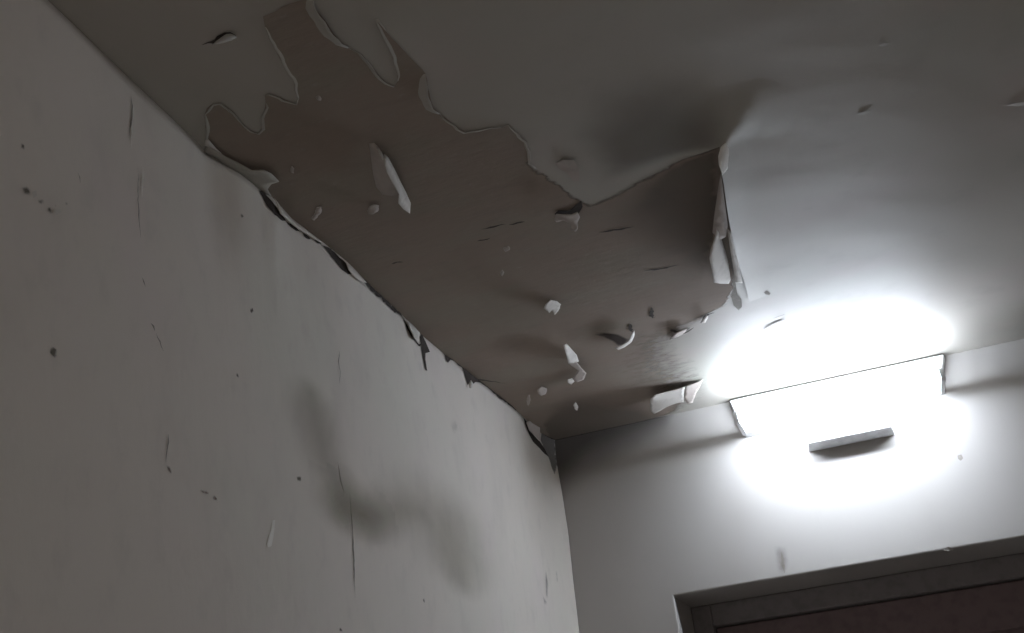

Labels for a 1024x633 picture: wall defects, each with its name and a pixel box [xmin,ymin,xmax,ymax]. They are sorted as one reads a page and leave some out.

peeling [204,0,733,456]